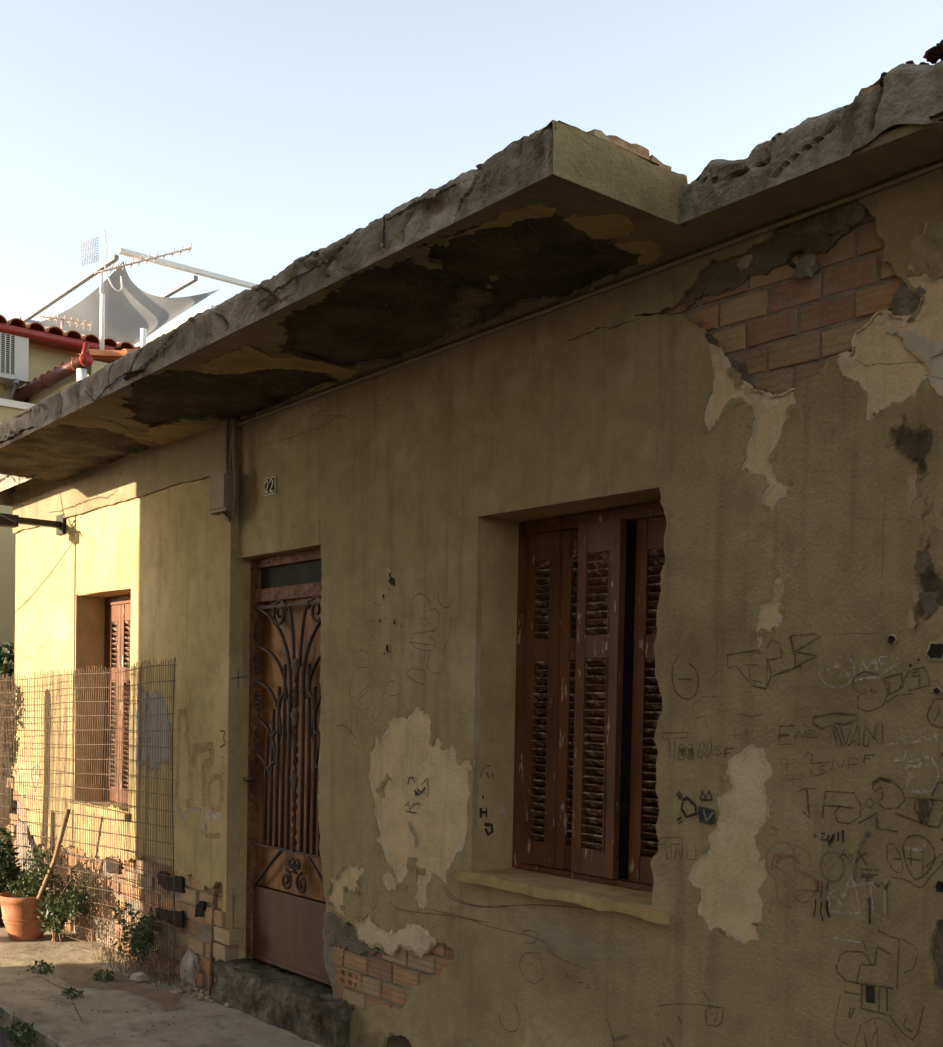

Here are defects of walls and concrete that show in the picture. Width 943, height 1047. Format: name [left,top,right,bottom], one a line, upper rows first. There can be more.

spalling [0,212,641,481]
spalling [662,199,943,512]
water stain [891,419,933,507]
peeling [752,573,790,648]
water stain [907,495,943,632]
peeling [368,704,475,909]
peeling [688,744,773,944]
spalling [322,860,454,1010]
spalling [926,920,943,989]
spalling [386,1034,412,1047]